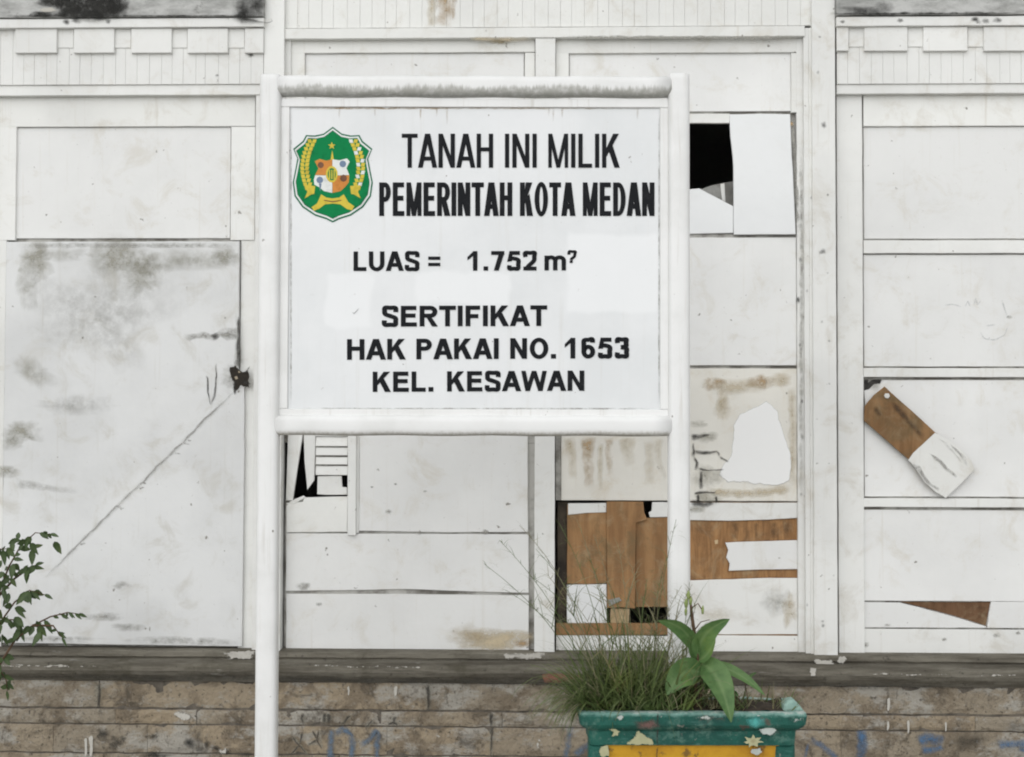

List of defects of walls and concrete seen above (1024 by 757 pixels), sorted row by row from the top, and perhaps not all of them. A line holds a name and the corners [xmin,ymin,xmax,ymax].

peeling [790,122,802,220]
crack [65,373,219,558]
peeling [690,519,797,579]
peeling [902,601,990,626]